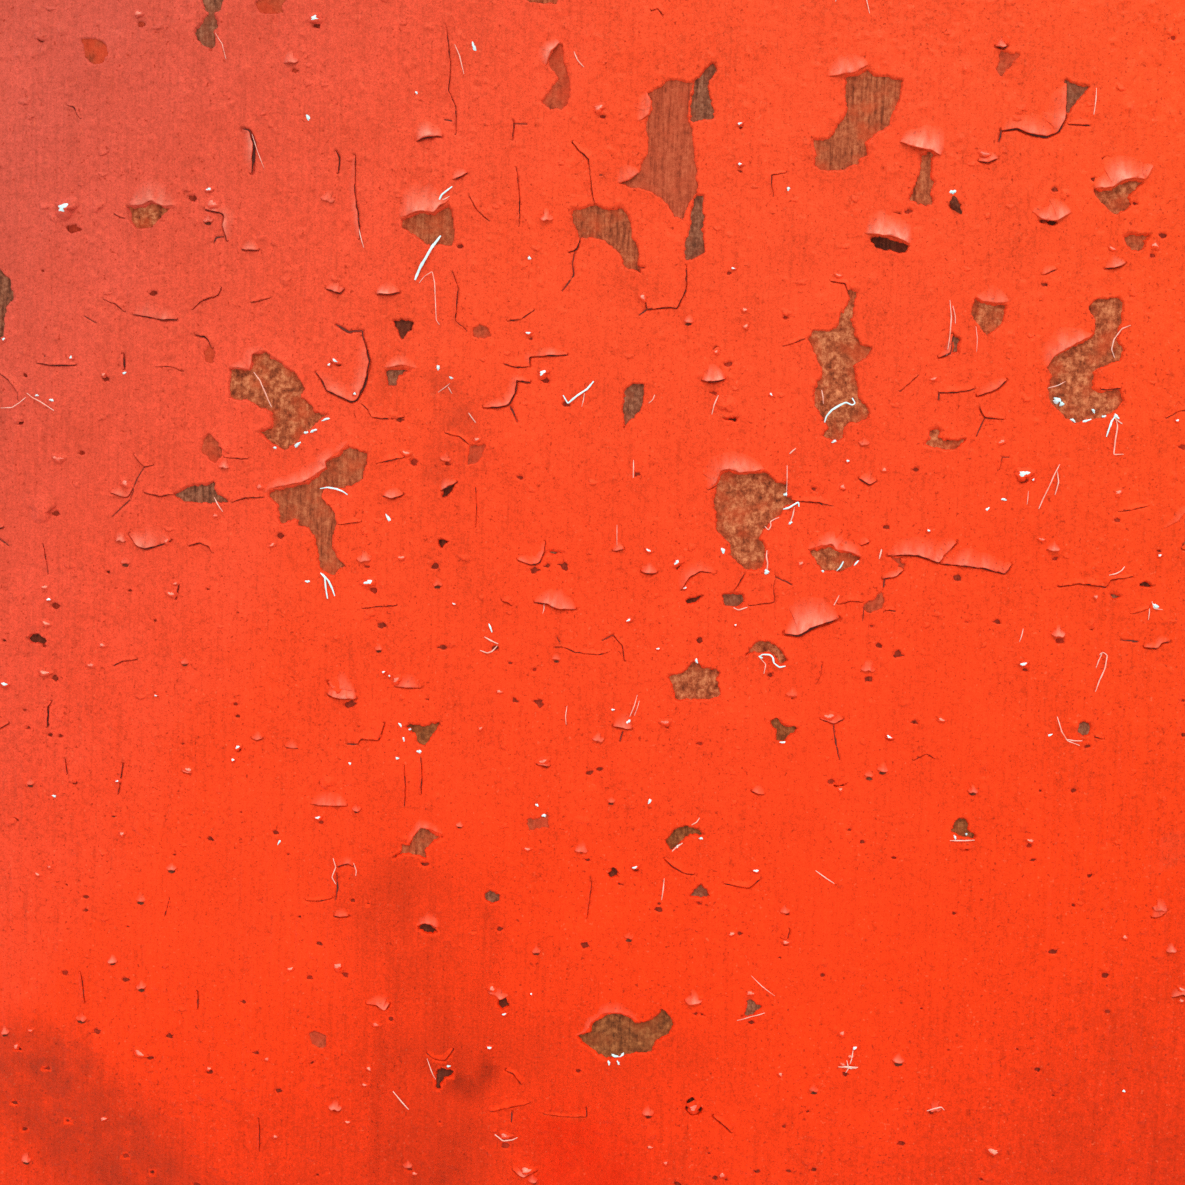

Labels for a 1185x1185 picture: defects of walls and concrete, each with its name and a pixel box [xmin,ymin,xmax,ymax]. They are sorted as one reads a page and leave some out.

peeling [399,179,464,248]
peeling [572,205,645,272]
peeling [617,64,717,260]
peeling [814,53,902,171]
peeling [1091,155,1154,214]
peeling [228,345,330,450]
peeling [808,290,871,443]
peeling [1040,298,1123,423]
peeling [264,440,367,575]
peeling [704,450,794,574]
peeling [669,658,720,700]
peeling [574,1002,673,1065]